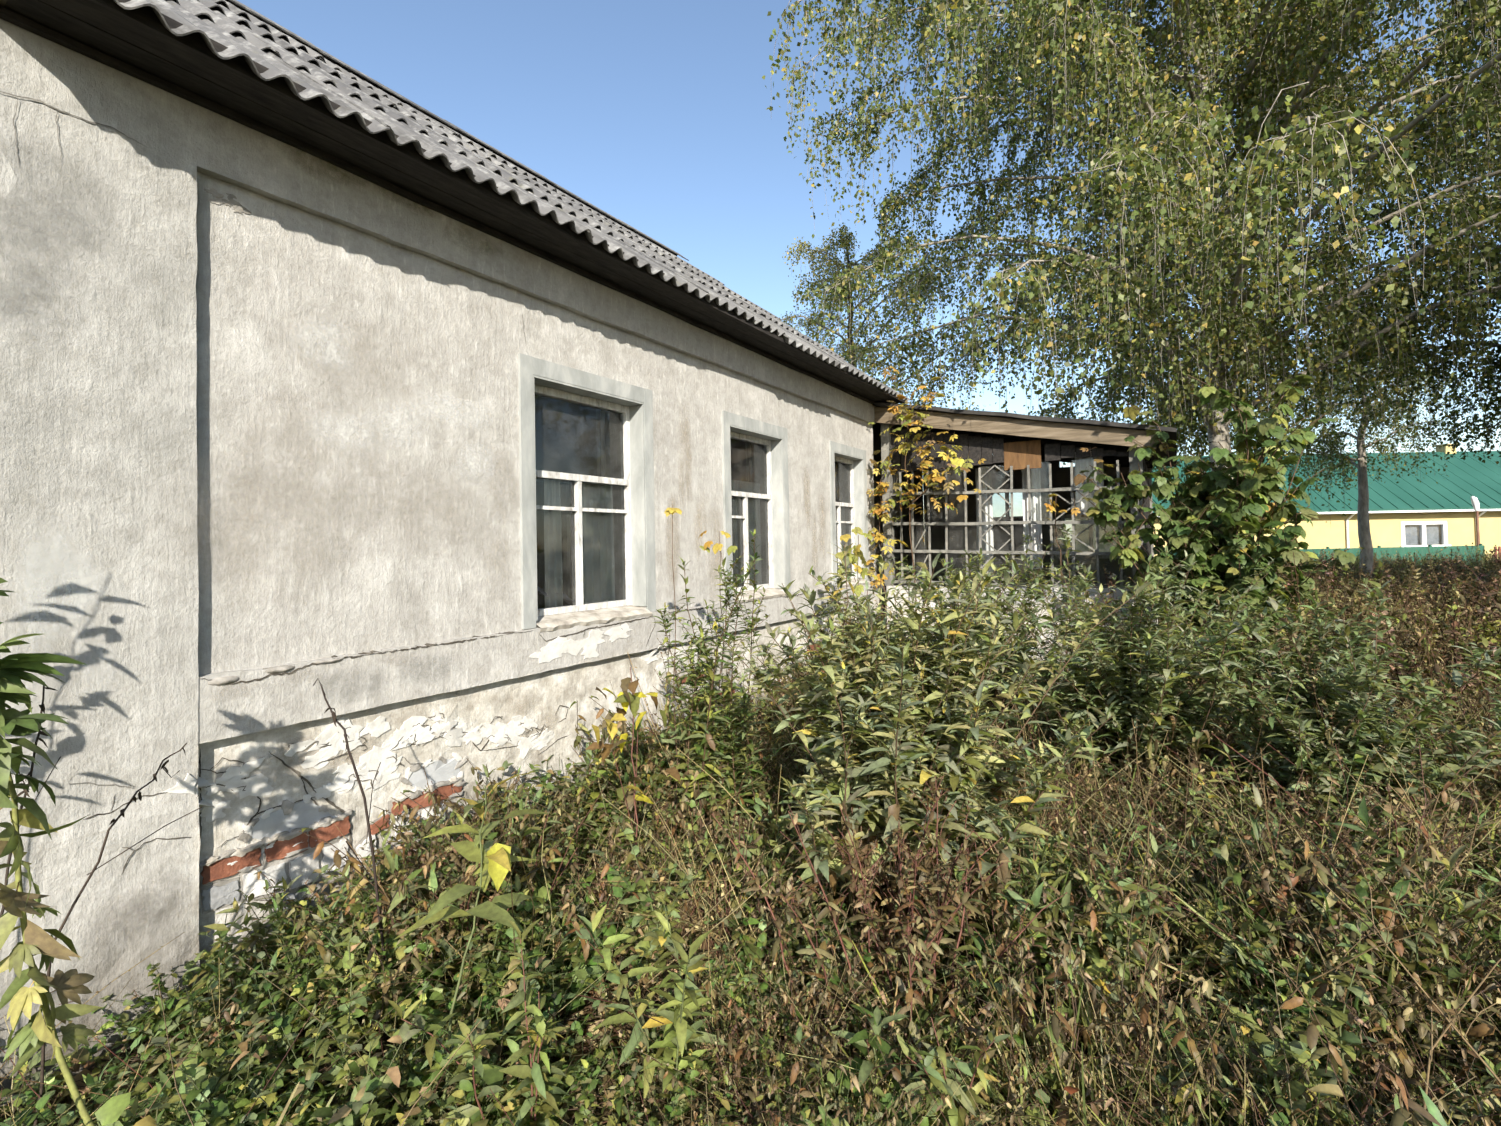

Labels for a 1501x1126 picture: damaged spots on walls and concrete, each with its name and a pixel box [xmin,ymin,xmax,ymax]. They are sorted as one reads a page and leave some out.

crack [0,91,148,170]
peeling [530,623,633,663]
peeling [163,712,554,918]